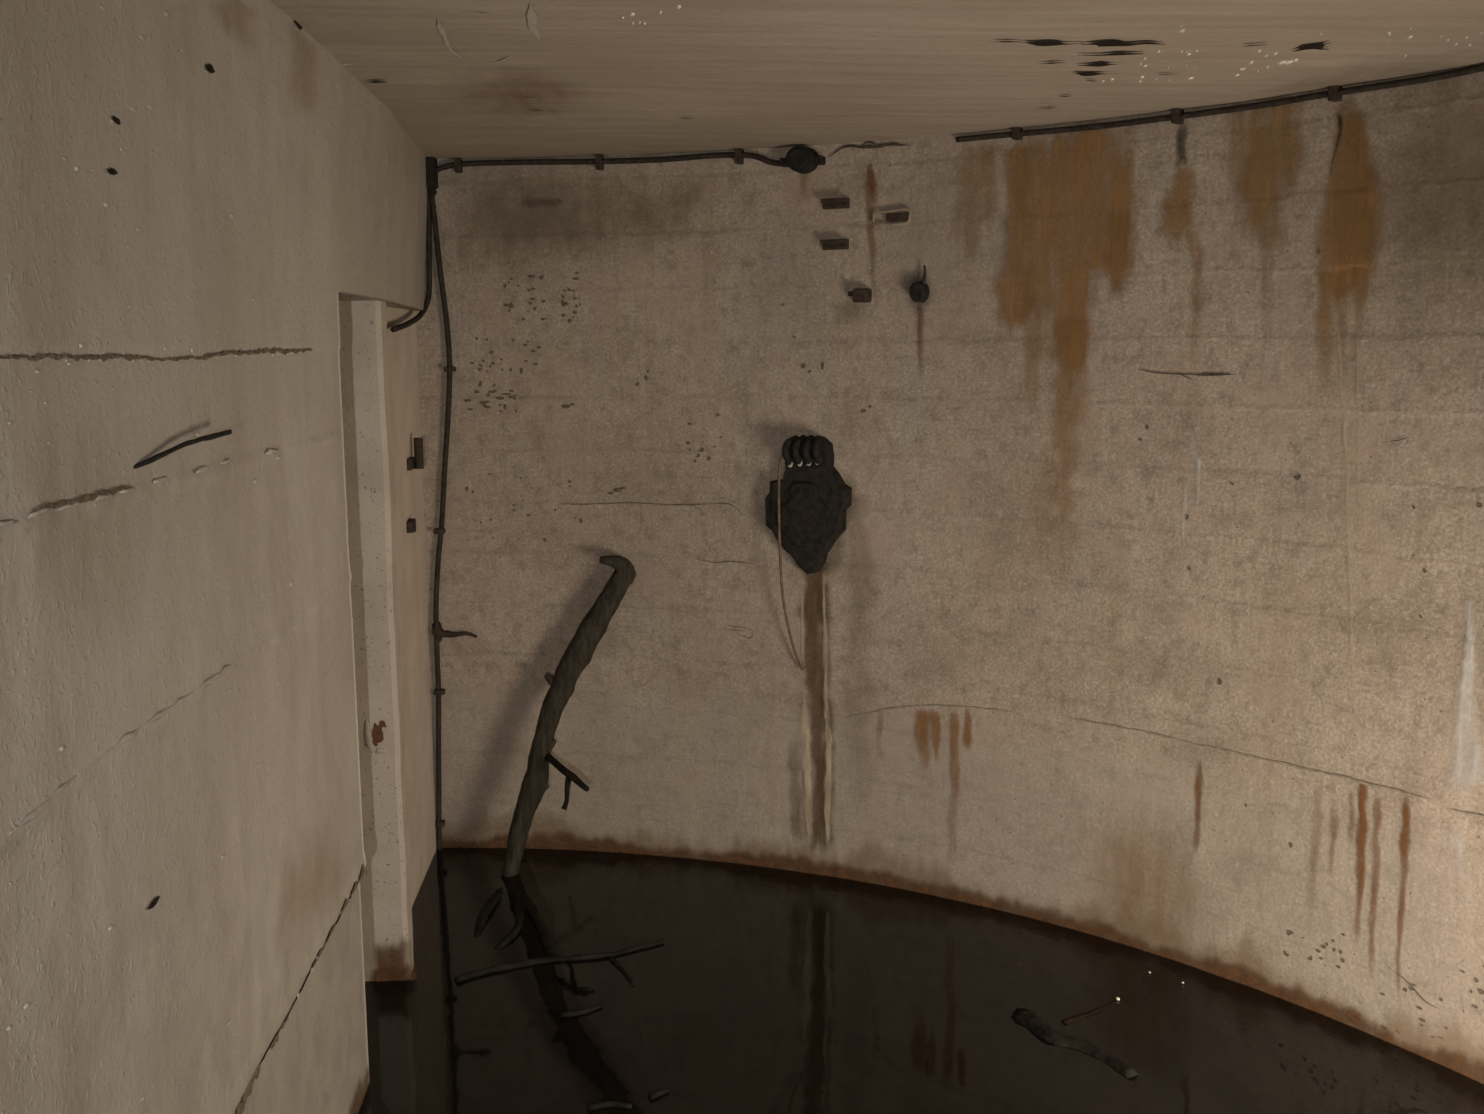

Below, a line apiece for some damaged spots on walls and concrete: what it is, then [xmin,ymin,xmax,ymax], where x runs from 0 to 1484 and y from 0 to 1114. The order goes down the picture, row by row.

crack [0,348,313,362]
corrosion [916,712,971,755]
leakage [442,537,1484,1083]
corrosion [1357,784,1380,912]
corrosion [1400,804,1410,867]